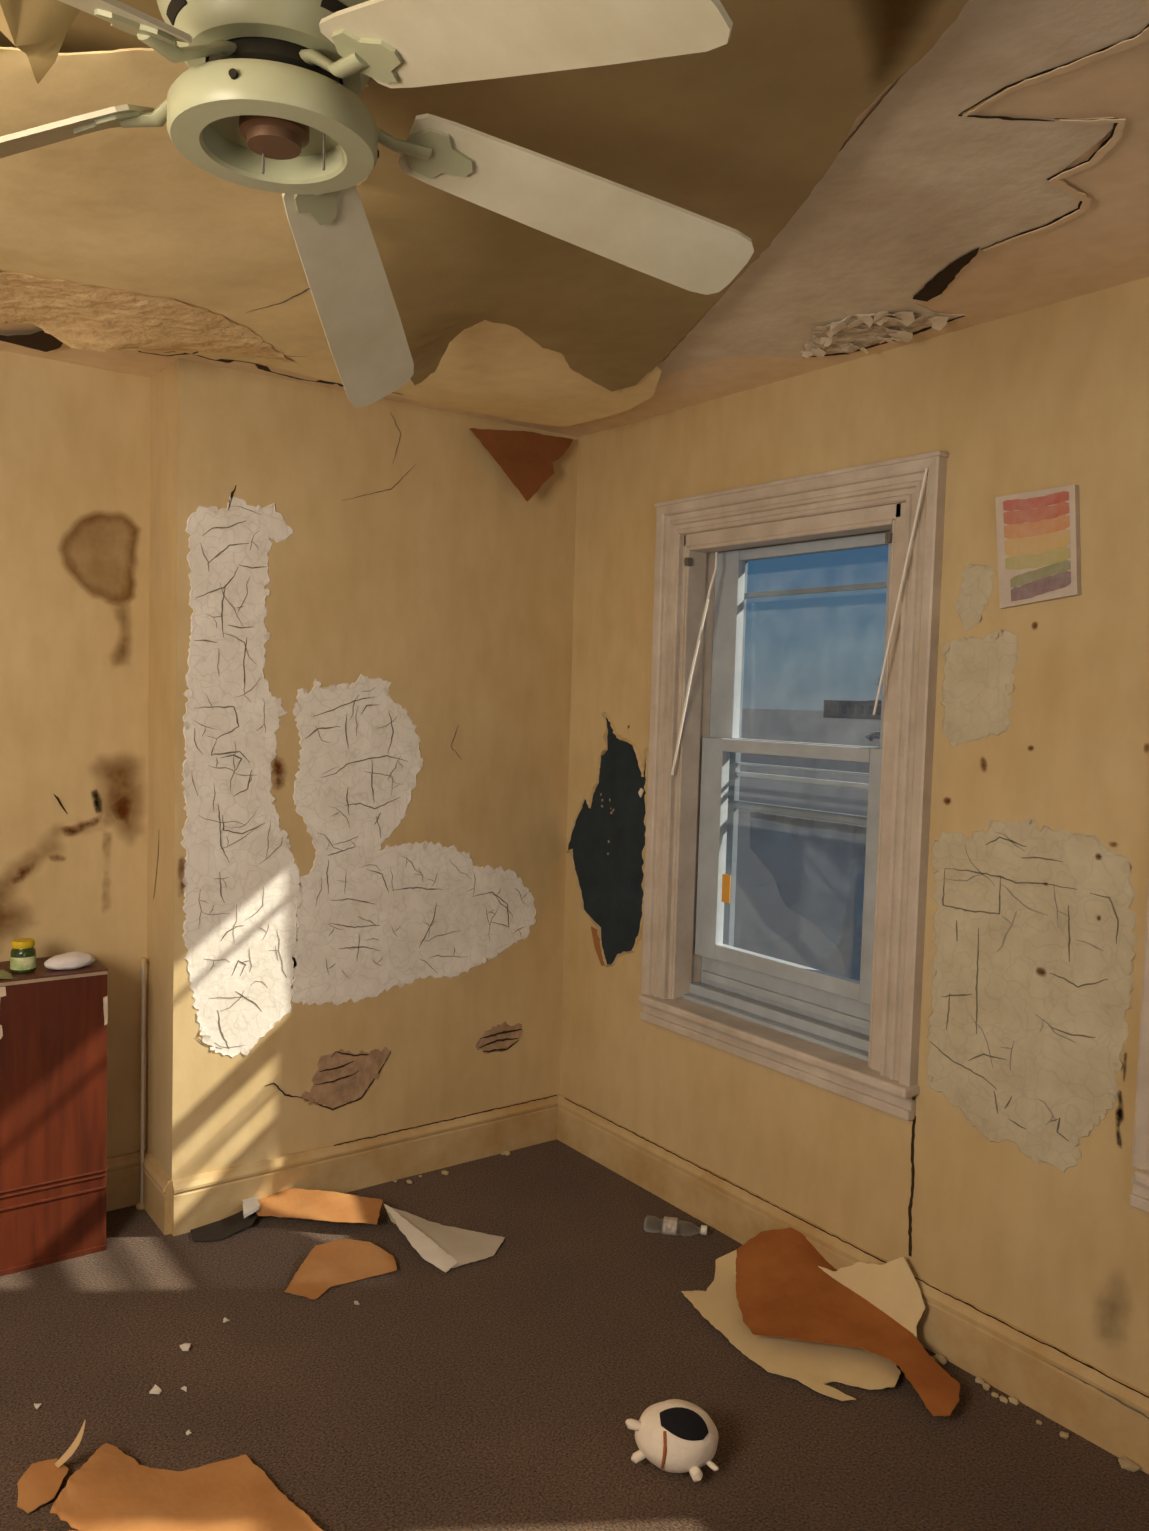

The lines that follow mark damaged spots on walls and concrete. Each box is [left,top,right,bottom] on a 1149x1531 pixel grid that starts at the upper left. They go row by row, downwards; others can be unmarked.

damp [871,0,924,64]
flaking render [657,0,1149,381]
peeling [470,428,573,502]
damp [64,514,137,602]
peeling [940,563,1019,746]
damp [65,765,133,834]
peeling [180,496,536,1058]
spalling [565,711,649,967]
flaking render [265,1047,391,1110]
peeling [926,817,1137,1173]
crack [334,1095,1149,1419]